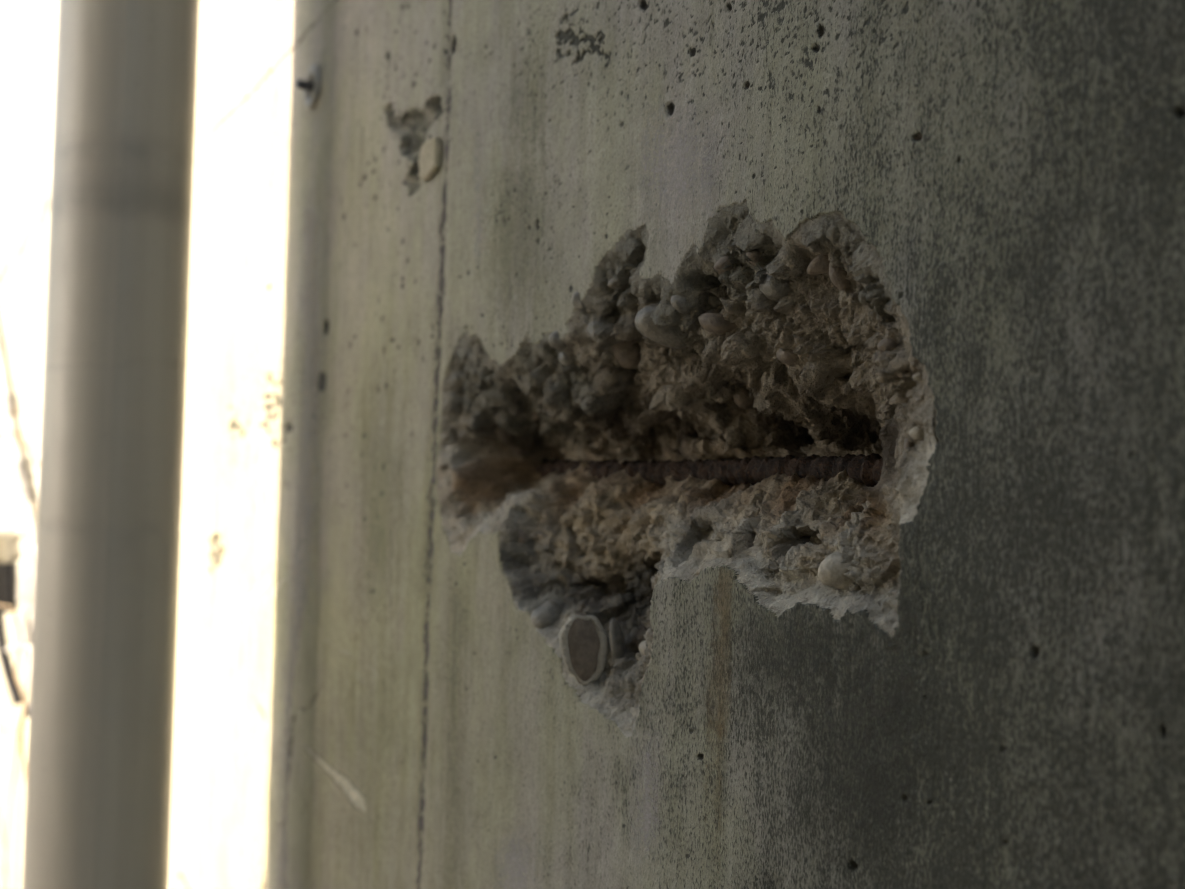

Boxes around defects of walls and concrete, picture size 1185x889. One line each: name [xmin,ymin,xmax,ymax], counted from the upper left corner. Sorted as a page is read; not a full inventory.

spalling [381,94,444,195]
spalling [436,199,939,738]